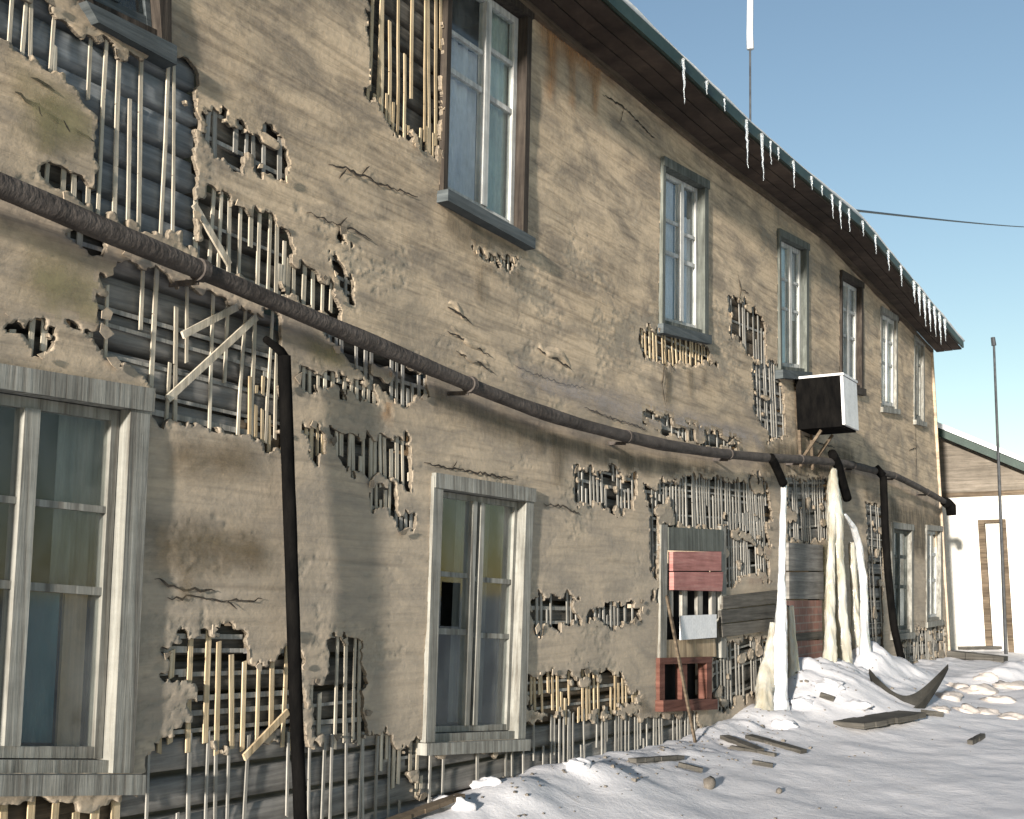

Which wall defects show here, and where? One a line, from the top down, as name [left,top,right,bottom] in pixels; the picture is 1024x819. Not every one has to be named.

flaking render [0,0,353,318]
crack [328,164,418,197]
flaking render [364,0,445,158]
crack [603,95,655,138]
flaking render [70,251,280,453]
crack [424,462,513,479]
flaking render [573,464,773,587]
flaking render [0,624,293,819]
crack [157,578,262,609]
flaking render [303,633,703,819]
flaking render [530,591,653,637]
flaking render [712,634,768,713]